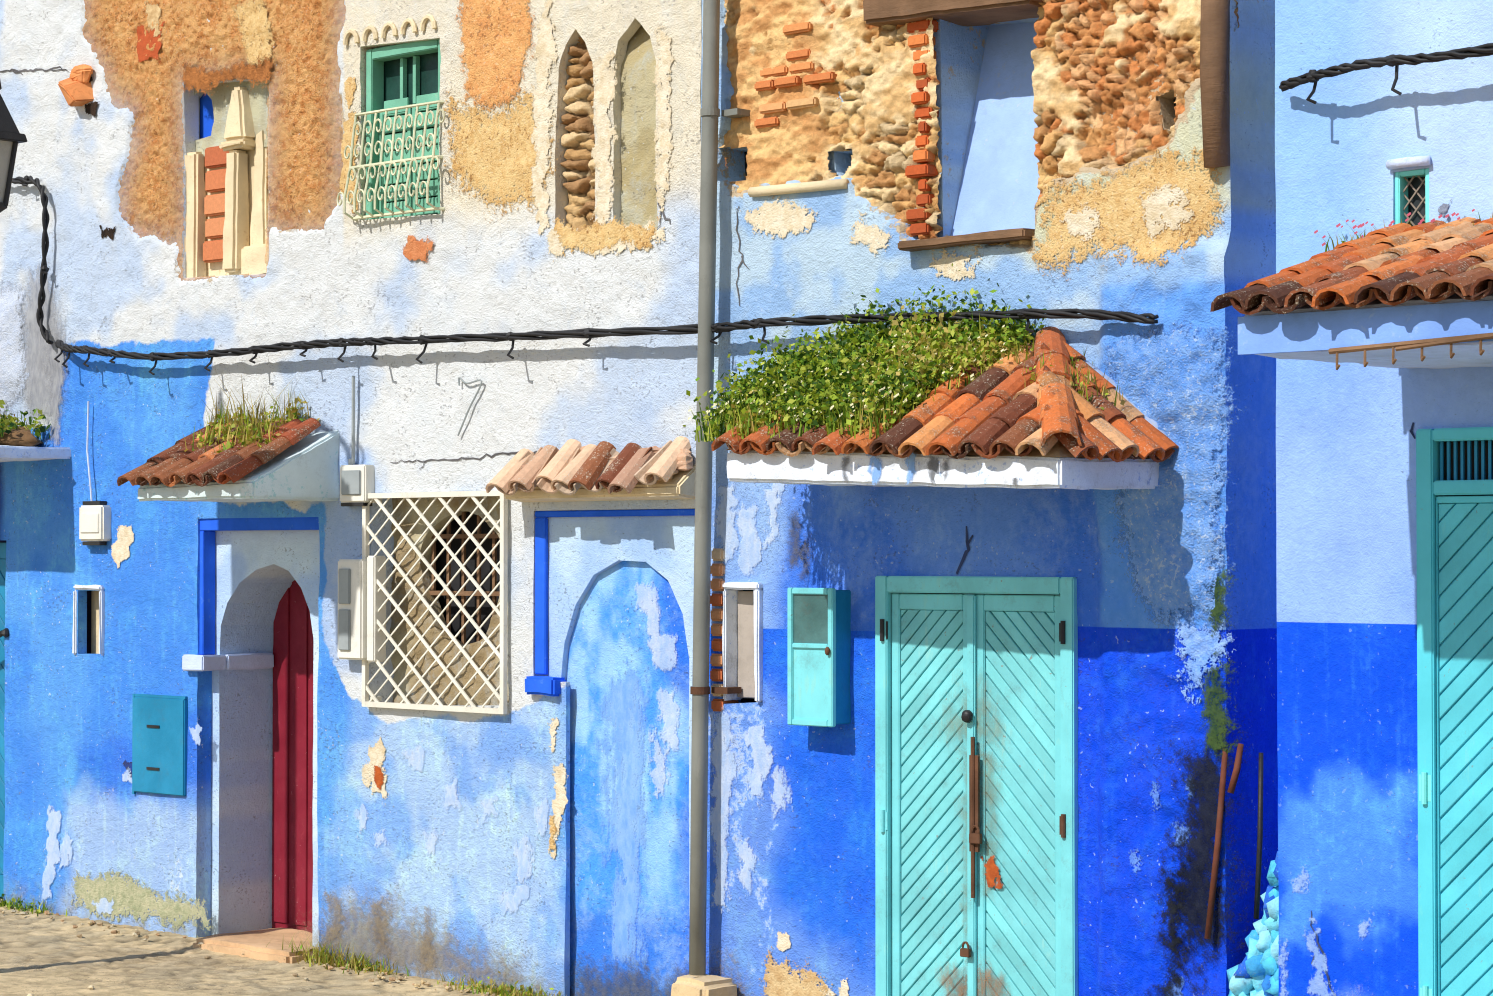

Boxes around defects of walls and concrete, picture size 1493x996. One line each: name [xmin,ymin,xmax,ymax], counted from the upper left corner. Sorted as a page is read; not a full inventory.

flaking render [58,0,360,280]
flaking render [718,0,1230,282]
peeling [354,737,424,846]
peeling [443,777,462,809]
peeling [497,717,569,915]
peeling [709,706,792,912]
rust [981,855,1003,889]
damp [1147,721,1251,996]
damp [312,893,514,986]
peeling [759,932,849,996]
rust [941,970,1002,996]